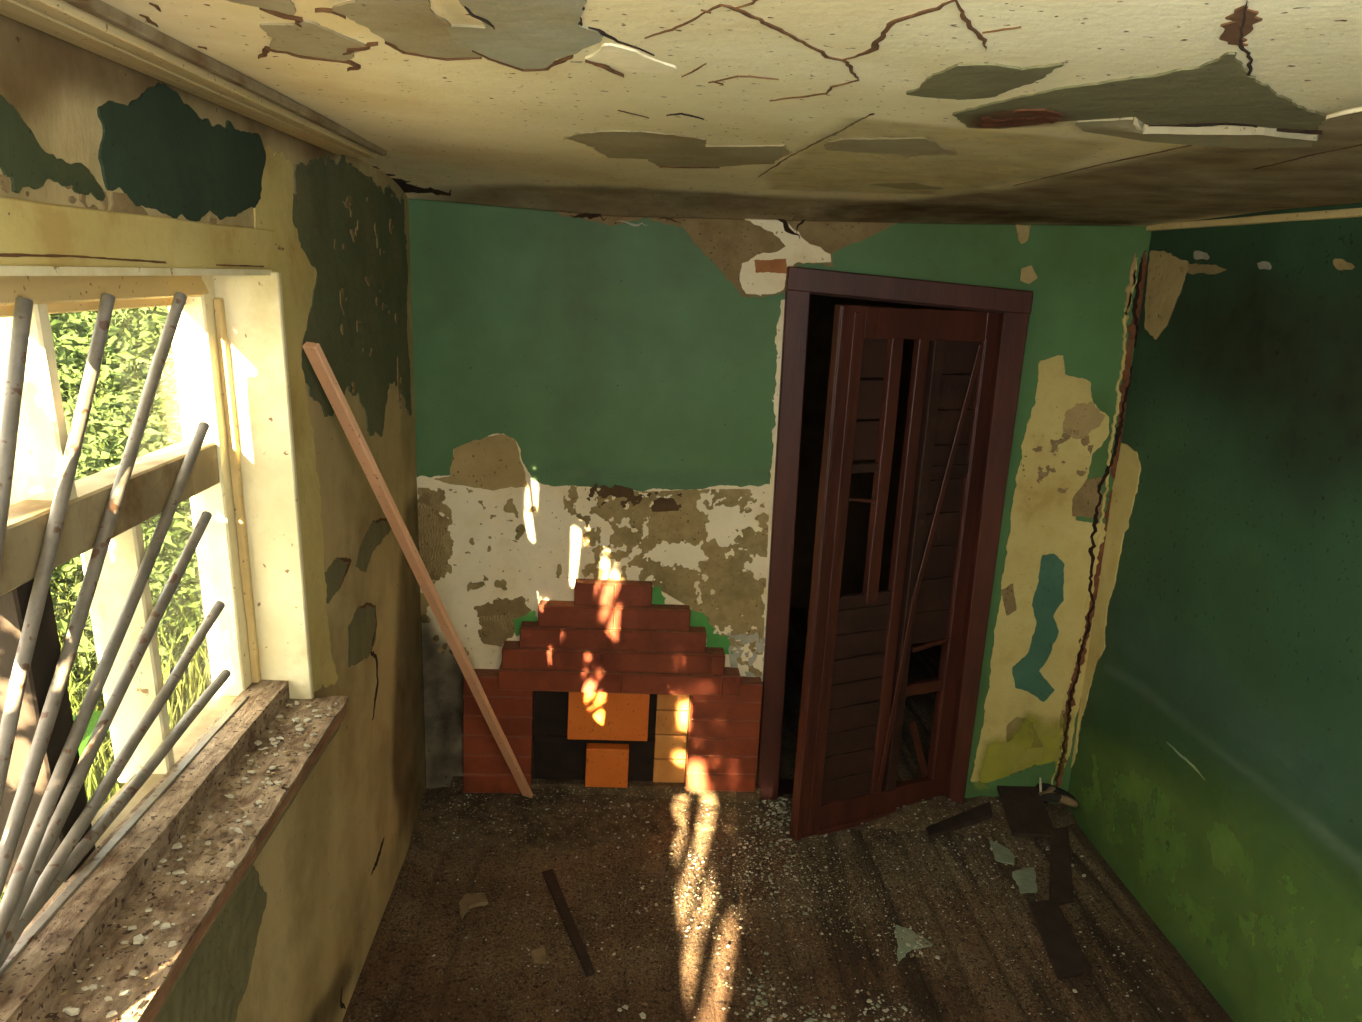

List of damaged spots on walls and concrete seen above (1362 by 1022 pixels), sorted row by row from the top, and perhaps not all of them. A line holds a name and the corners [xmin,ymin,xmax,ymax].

peeling [226,0,677,78]
crack [618,110,704,120]
peeling [564,130,792,168]
crack [578,0,1021,101]
peeling [824,137,958,155]
peeling [906,52,1327,149]
spalling [1144,250,1227,340]
peeling [0,83,412,692]
peeling [417,211,900,681]
crack [1051,250,1147,787]
peeling [970,355,1141,791]
peeling [155,865,267,1022]